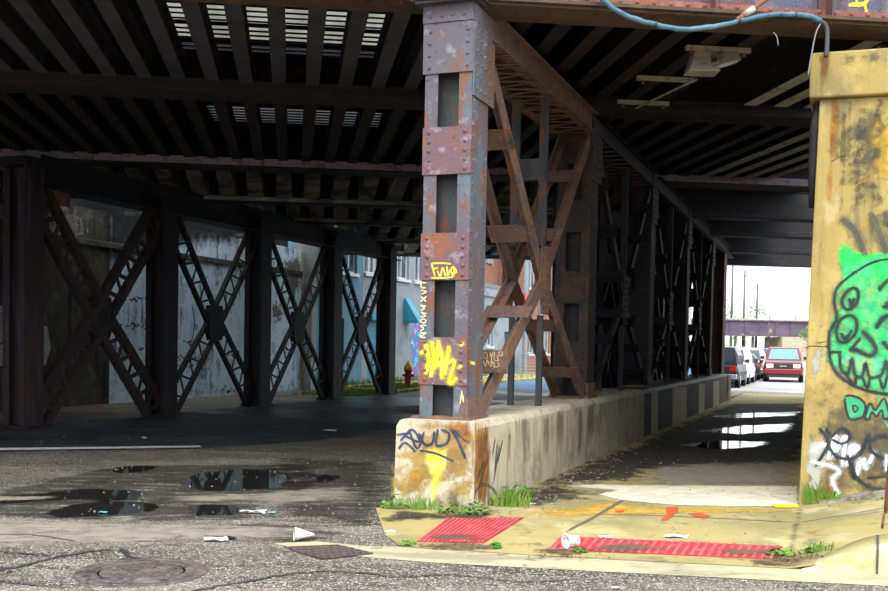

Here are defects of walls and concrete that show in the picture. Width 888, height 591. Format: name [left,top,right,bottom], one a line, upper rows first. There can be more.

damp [834,108,884,199]
damp [672,386,687,425]
damp [699,381,719,413]